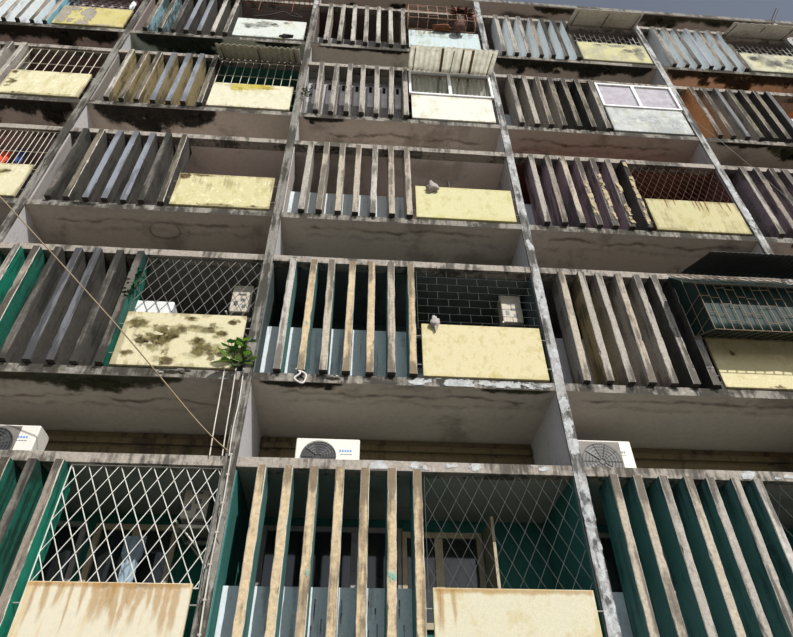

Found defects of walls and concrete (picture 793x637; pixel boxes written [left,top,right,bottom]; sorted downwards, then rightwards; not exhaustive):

damp [0,21,119,46]
damp [0,70,73,125]
damp [93,104,216,132]
damp [717,142,793,162]
peeling [598,174,618,219]
peeling [622,162,651,224]
peeling [534,277,550,321]
damp [120,316,240,365]
peeling [550,346,563,377]
damp [0,369,182,401]
peeling [578,482,621,635]